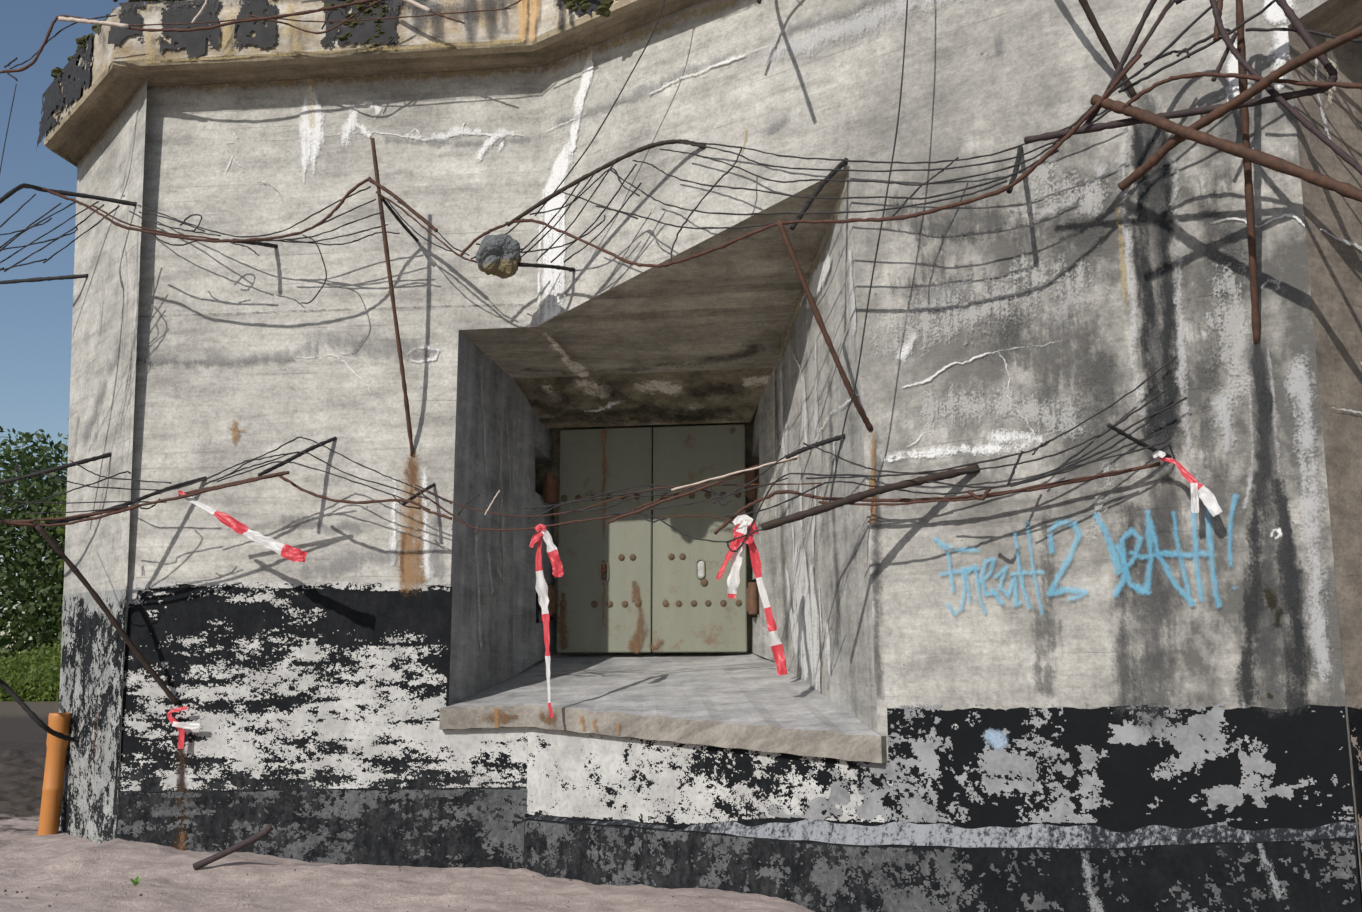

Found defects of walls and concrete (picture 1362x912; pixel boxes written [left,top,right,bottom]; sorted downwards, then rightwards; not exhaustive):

water stain [112,0,520,65]
water stain [555,0,573,30]
water stain [766,0,945,61]
water stain [527,46,857,692]
water stain [869,93,1331,724]
corrosion [388,455,434,590]
peeling [59,580,1362,912]